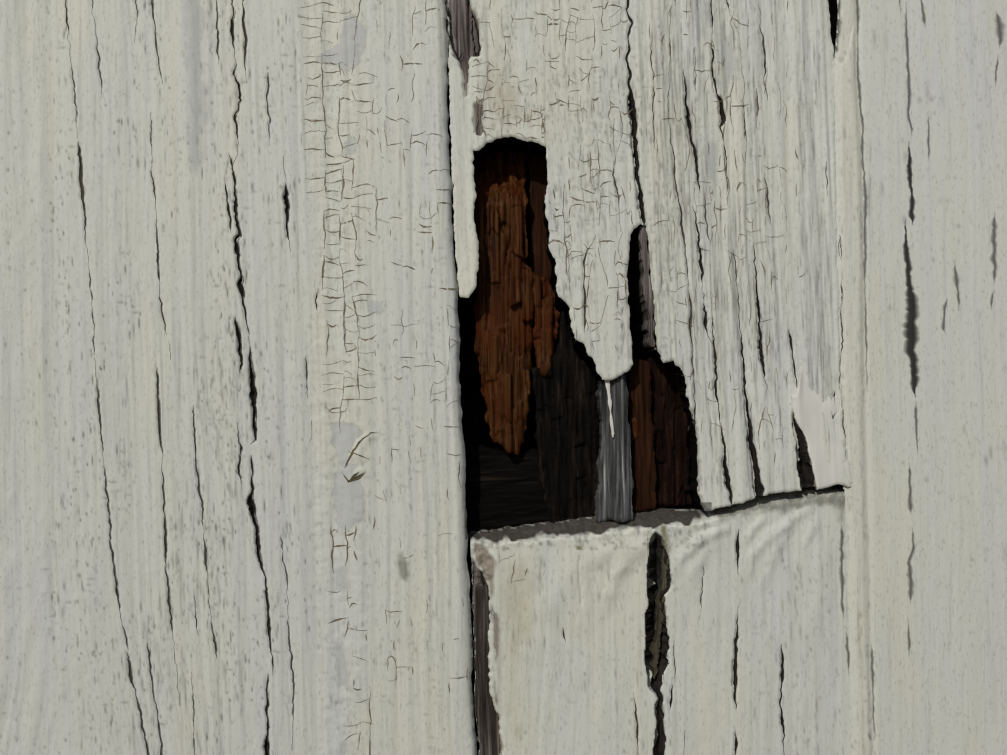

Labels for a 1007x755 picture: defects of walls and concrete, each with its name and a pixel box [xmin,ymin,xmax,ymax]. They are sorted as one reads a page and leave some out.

crack [994,15,1002,80]
crack [899,0,929,511]
crack [943,268,959,330]
crack [989,217,997,305]
crack [65,0,217,755]
crack [216,0,814,755]
peeling [791,360,853,490]
crack [907,535,915,600]